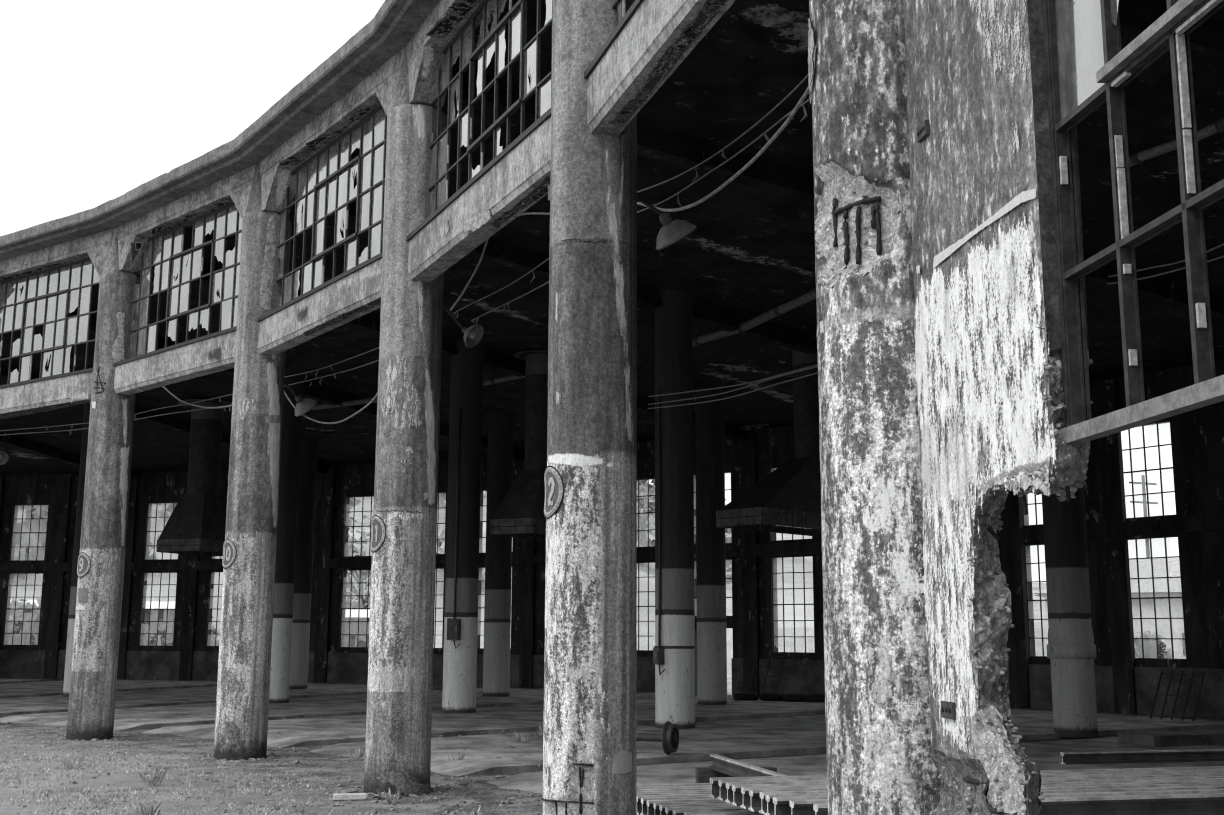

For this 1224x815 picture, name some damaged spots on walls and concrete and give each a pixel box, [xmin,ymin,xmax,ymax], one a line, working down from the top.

peeling [426,0,479,37]
leakage [268,307,307,335]
leakage [343,267,381,286]
leakage [416,281,436,505]
leakage [606,150,633,441]
peeling [862,205,1090,815]